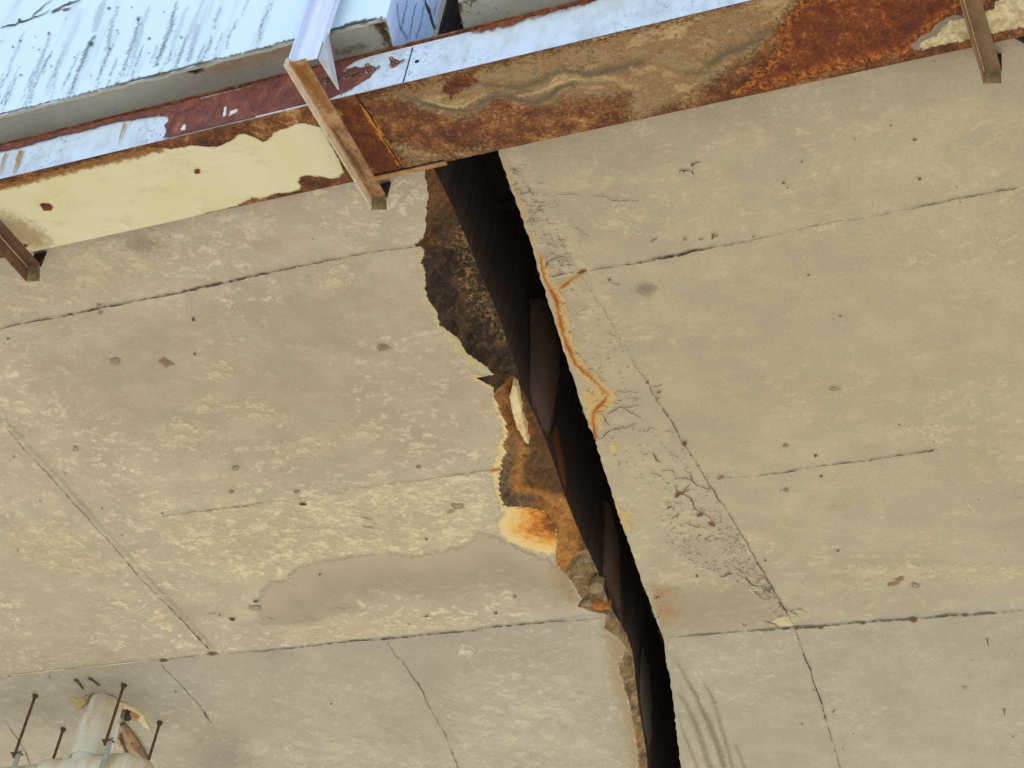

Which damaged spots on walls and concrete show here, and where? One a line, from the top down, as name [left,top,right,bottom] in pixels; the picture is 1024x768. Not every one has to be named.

peeling [0,122,344,252]
rust [0,56,404,190]
rust [441,72,480,100]
rust [470,0,592,33]
rust [731,0,961,95]
rust [537,255,616,440]
crack [511,164,802,631]
spalling [415,168,648,768]
water stain [165,472,573,643]